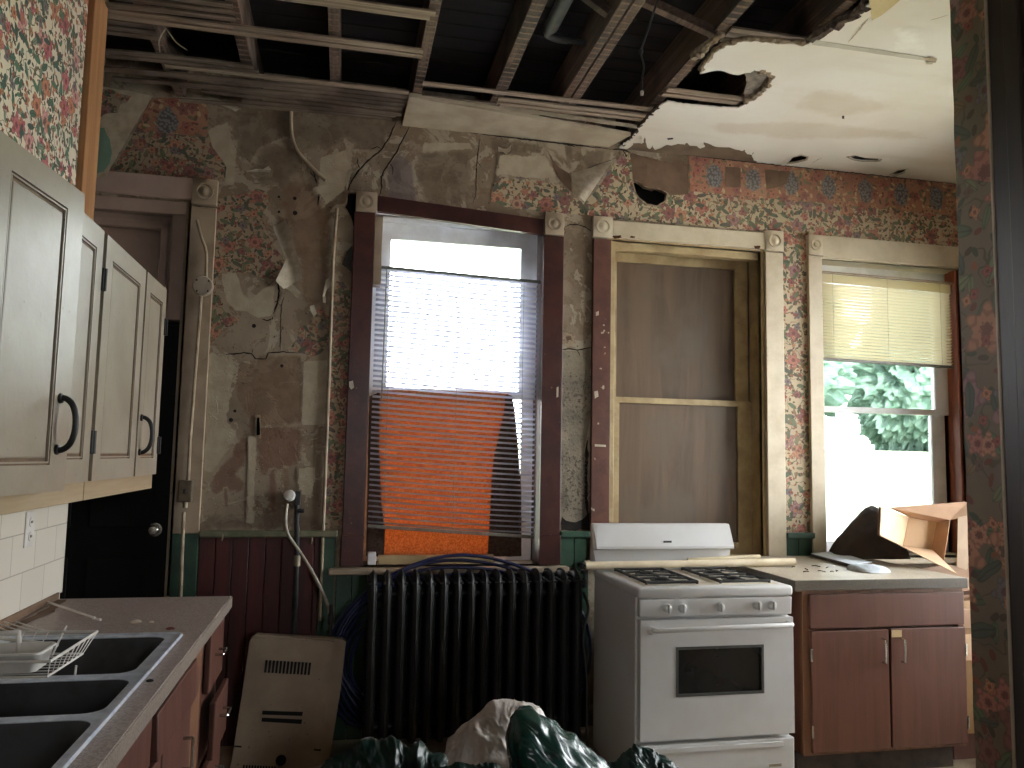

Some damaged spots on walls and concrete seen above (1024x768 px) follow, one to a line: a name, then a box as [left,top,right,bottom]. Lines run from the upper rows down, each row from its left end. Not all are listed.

flaking render [689,0,871,72]
flaking render [742,70,776,105]
peeling [620,104,757,162]
crack [348,122,410,194]
flaking render [343,189,357,227]
flaking render [632,180,668,207]
flaking render [340,245,353,274]
peeling [310,278,331,316]
crack [226,279,296,360]